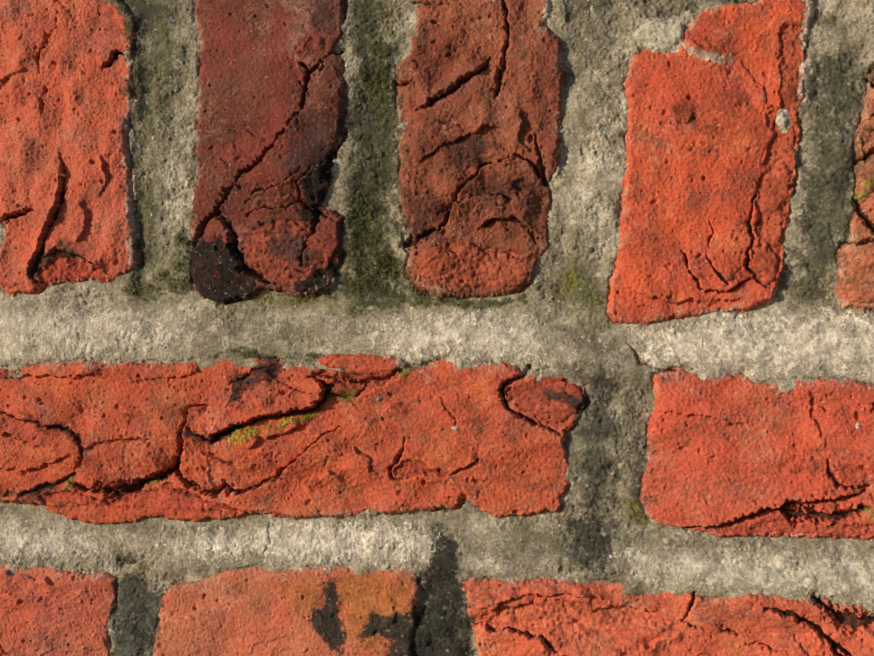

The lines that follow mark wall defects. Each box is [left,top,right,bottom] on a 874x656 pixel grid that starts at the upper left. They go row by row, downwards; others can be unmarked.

crack [429,0,510,107]
damp [335,0,555,370]
crack [0,170,80,283]
crack [685,199,765,293]
crack [839,201,874,247]
crack [207,371,360,441]
crack [501,365,554,431]
crack [23,420,295,496]
crack [686,466,869,529]
damp [155,515,476,656]
crack [487,623,554,650]
crack [764,596,874,656]